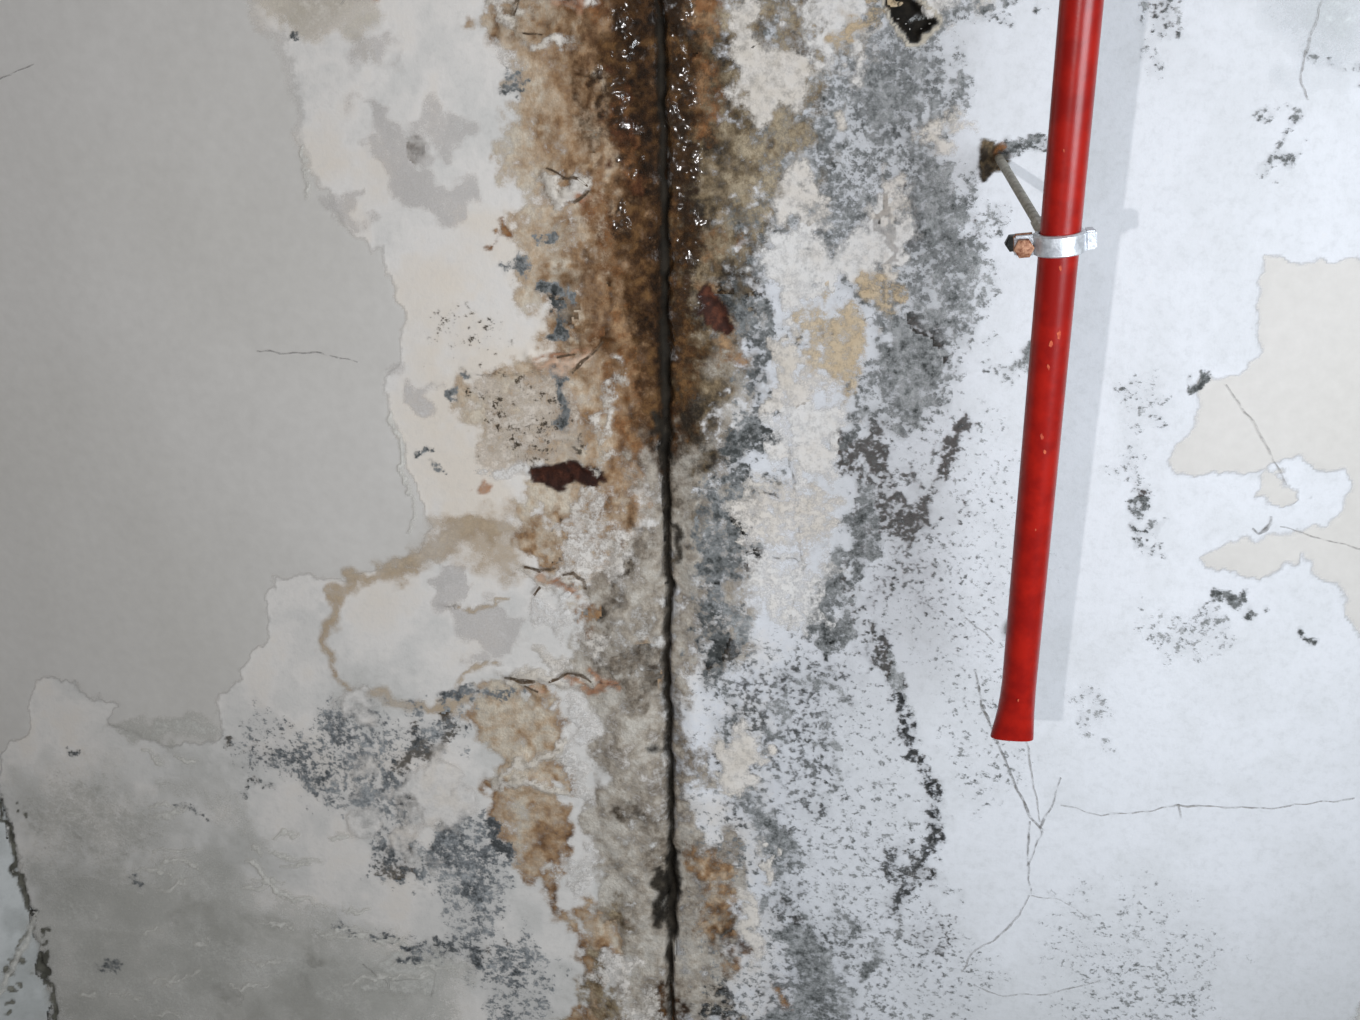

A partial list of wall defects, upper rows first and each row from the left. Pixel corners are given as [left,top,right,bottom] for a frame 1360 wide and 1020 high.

peeling [0,0,667,1020]
water stain [319,309,766,1020]
water stain [588,0,640,135]
water stain [610,198,641,242]
corrosion [451,0,827,608]
crack [650,0,684,1020]
water stain [657,0,735,355]
peeling [609,0,1360,1020]
crack [964,686,1090,996]